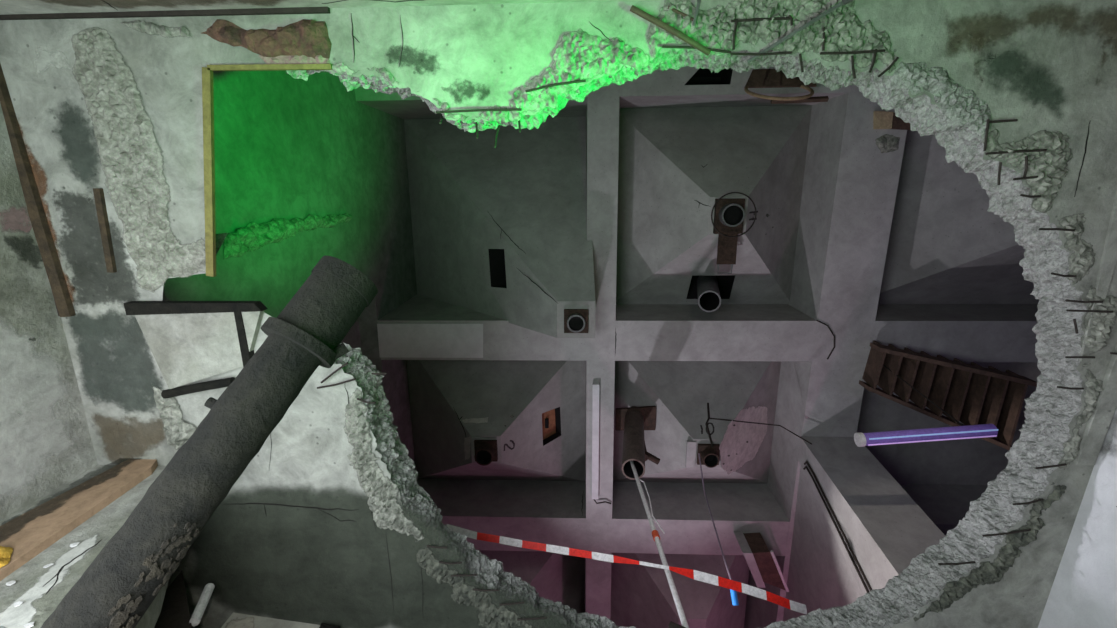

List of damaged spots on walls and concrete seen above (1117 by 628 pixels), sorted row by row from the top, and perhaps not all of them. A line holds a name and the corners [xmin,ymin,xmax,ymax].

damp [58,103,99,183]
damp [0,192,165,541]
spalling [286,0,1117,628]
damp [949,8,1117,62]